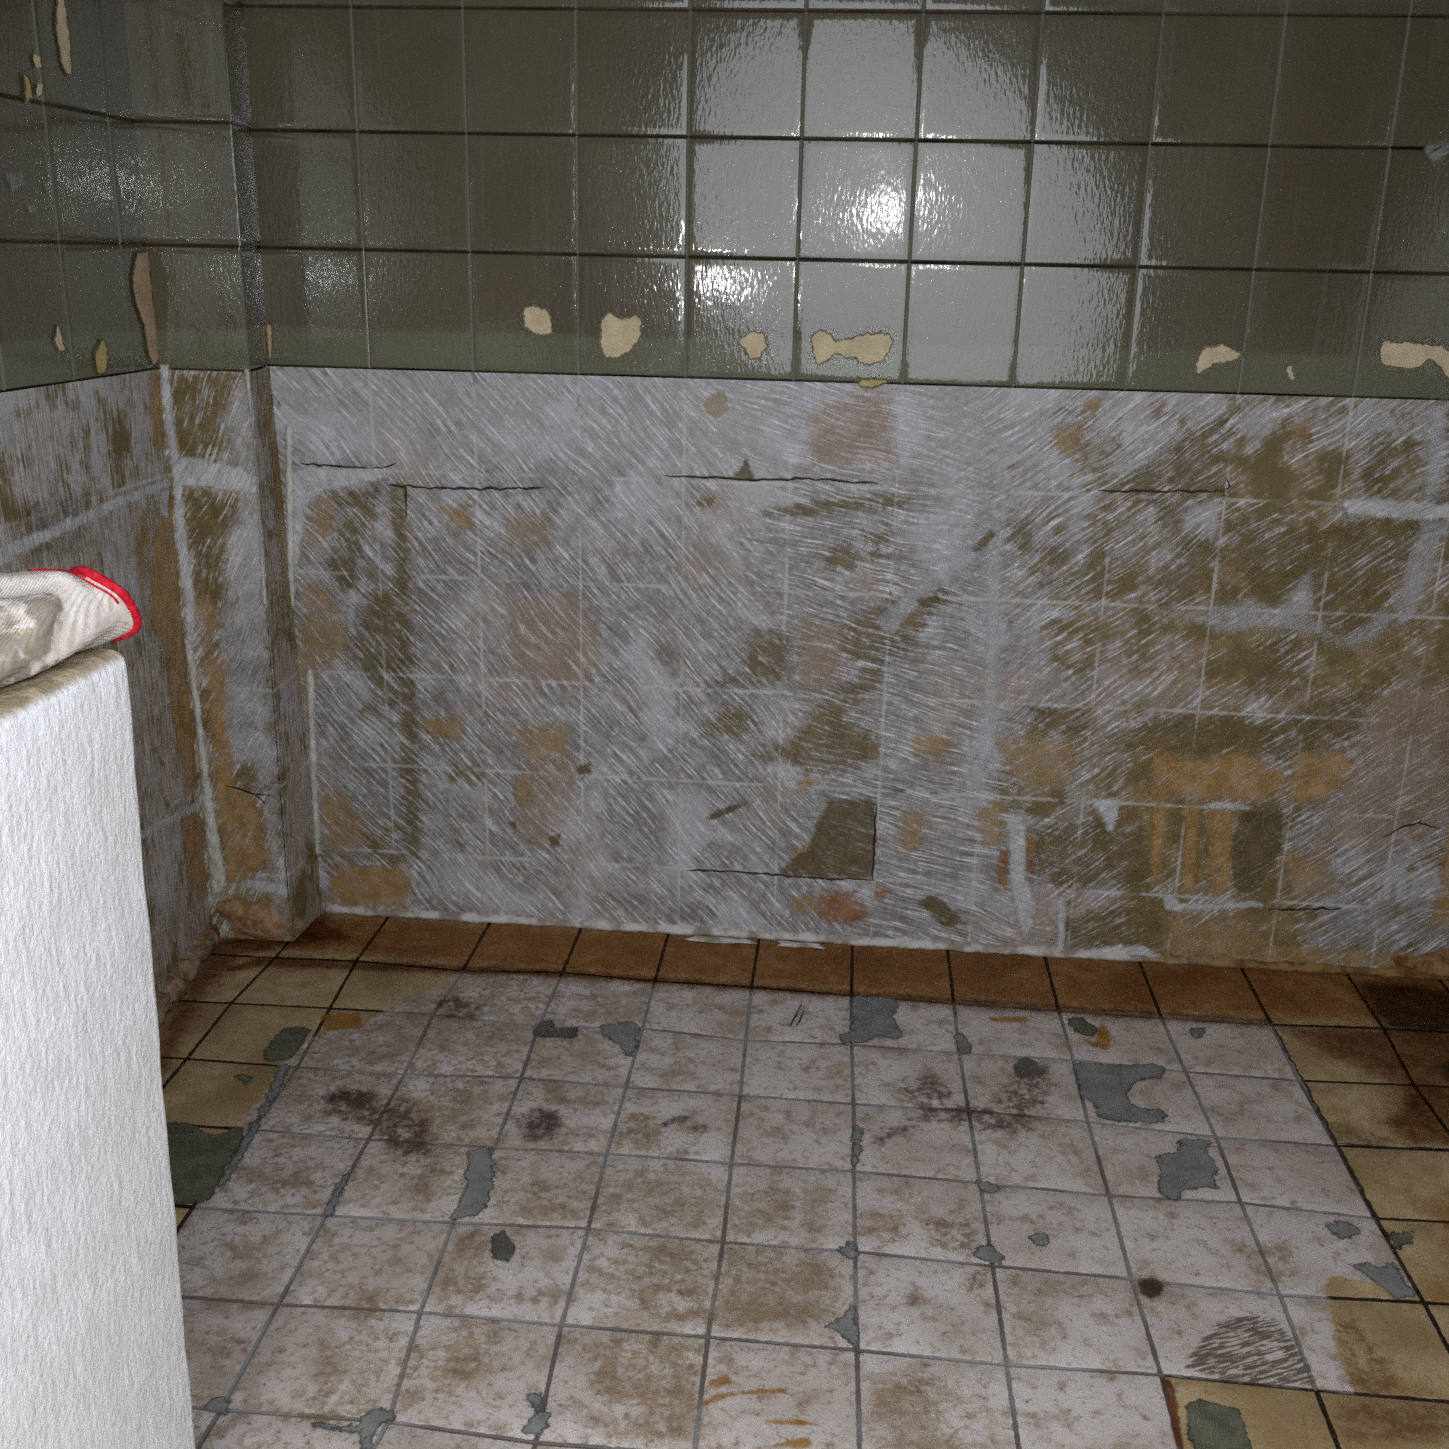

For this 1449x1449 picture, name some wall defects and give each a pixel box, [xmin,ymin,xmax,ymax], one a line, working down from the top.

peeling [523,304,553,336]
peeling [599,312,643,359]
peeling [1195,343,1243,375]
peeling [1379,339,1449,380]
water stain [267,613,290,905]
water stain [306,670,320,854]
water stain [1057,905,1066,949]
water stain [1316,984,1449,1114]
spalling [166,1027,311,1205]
spalling [1072,1063,1168,1124]
spalling [1155,1139,1219,1201]
spalling [1185,1399,1252,1449]